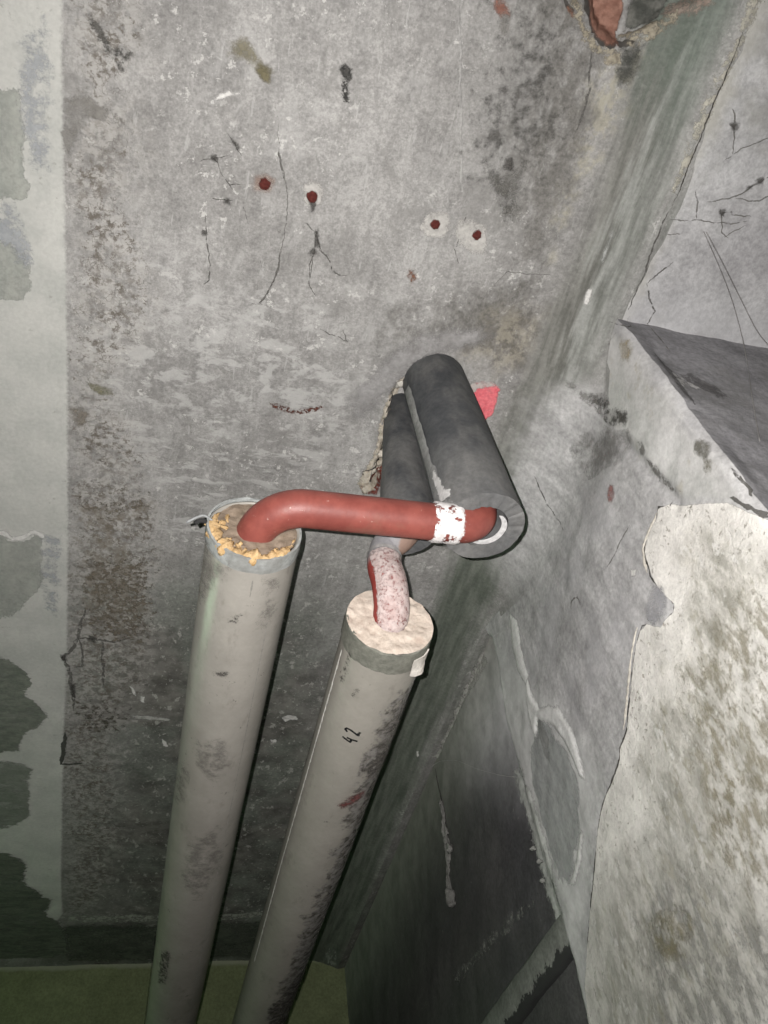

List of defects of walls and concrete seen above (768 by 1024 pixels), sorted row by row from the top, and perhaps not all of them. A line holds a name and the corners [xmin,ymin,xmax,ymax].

leakage [502,44,552,137]
leakage [617,45,640,83]
spalling [564,0,711,65]
crack [726,109,768,159]
crack [252,132,347,305]
leakage [489,158,524,216]
crack [609,177,768,350]
spalling [358,377,405,495]
mould [587,393,630,466]
crack [61,609,128,709]
peeling [585,503,768,1024]